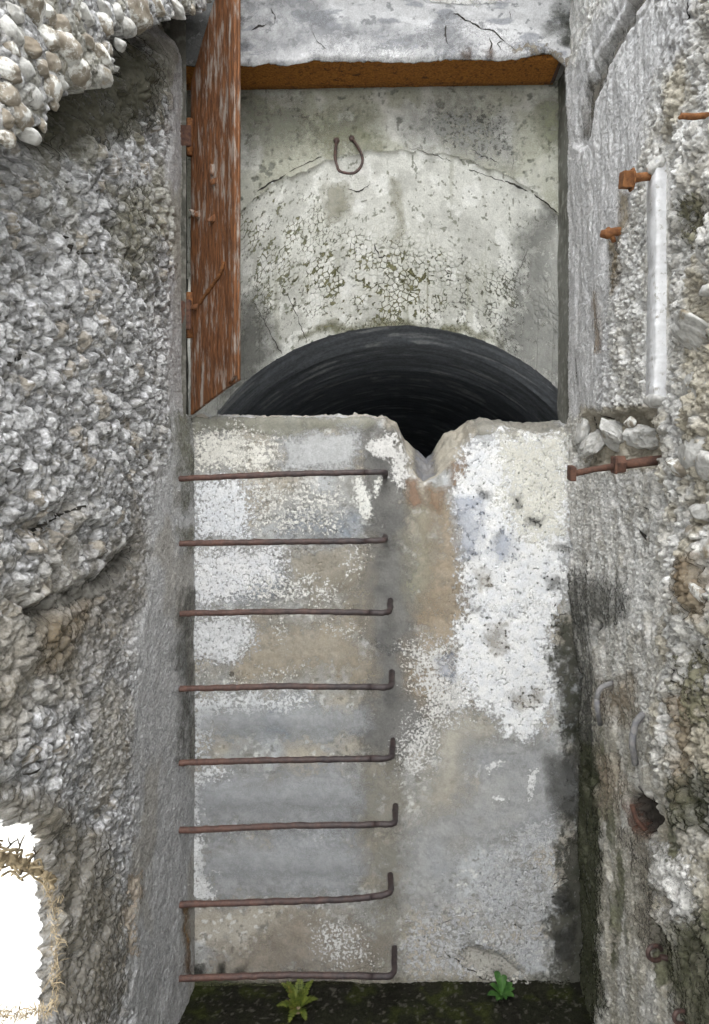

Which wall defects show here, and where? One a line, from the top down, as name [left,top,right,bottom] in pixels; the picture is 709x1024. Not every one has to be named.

crack [258,157,319,191]
crack [444,11,515,51]
spalling [698,283,709,297]
water stain [176,415,497,986]
peeling [192,405,709,984]
water stain [535,575,617,1024]